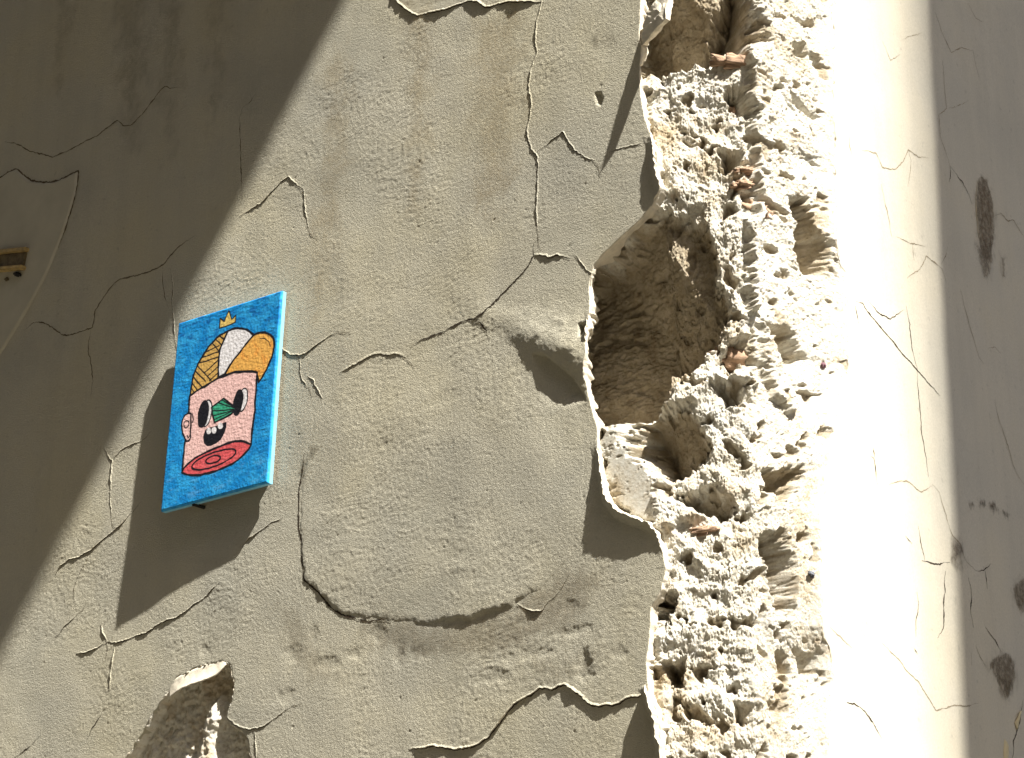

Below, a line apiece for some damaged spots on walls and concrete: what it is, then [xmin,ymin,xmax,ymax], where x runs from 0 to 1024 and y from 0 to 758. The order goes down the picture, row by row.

crack [0,86,177,248]
crack [26,236,194,390]
crack [239,96,316,238]
crack [282,332,347,399]
crack [339,0,640,374]
spalling [395,0,849,758]
crack [849,138,996,349]
crack [882,12,979,203]
crack [855,300,1001,665]
crack [54,430,220,737]
spalling [125,661,251,758]
crack [889,648,976,711]